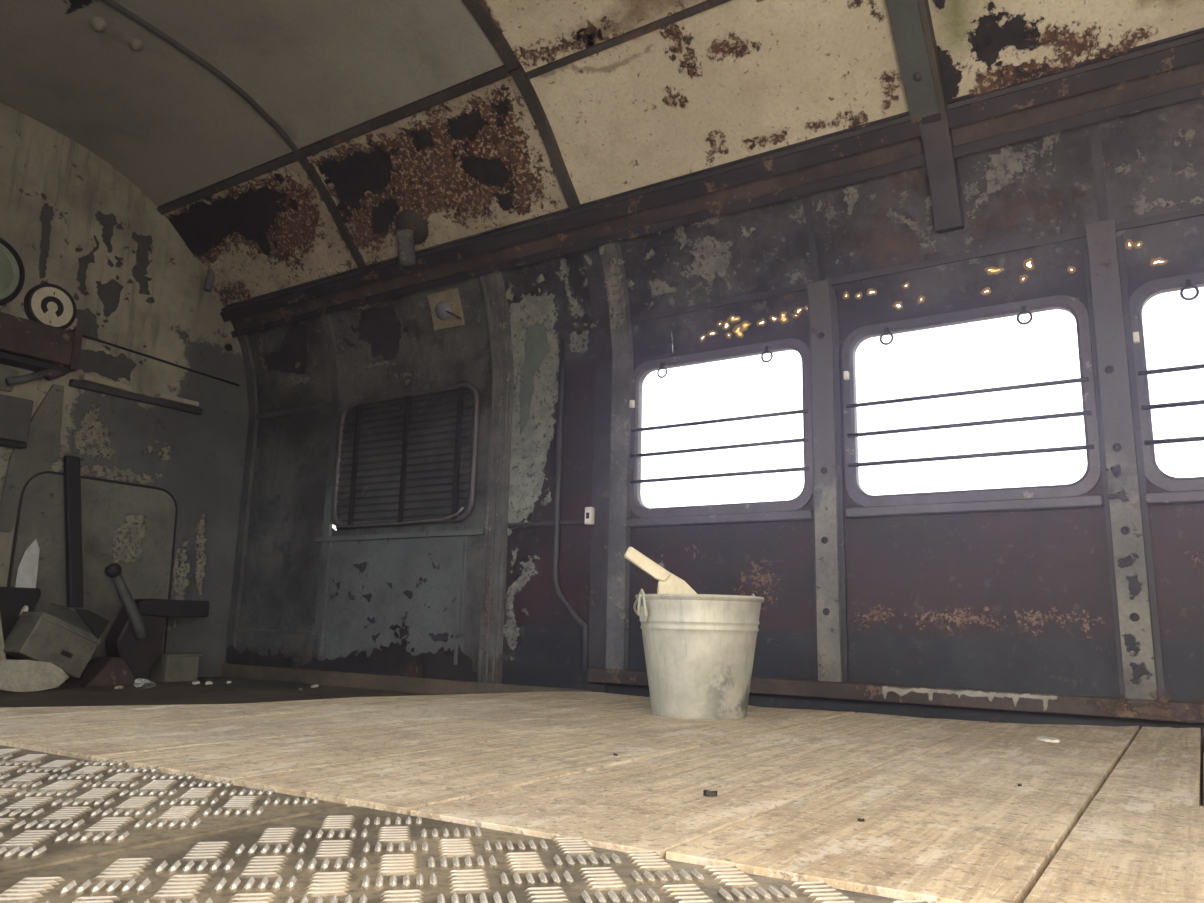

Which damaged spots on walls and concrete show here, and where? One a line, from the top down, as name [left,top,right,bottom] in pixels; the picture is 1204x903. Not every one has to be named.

corrosion [512,17,621,66]
corrosion [629,0,761,78]
corrosion [969,21,1158,97]
corrosion [744,127,787,150]
corrosion [805,111,869,132]
corrosion [164,85,557,272]
peeling [961,134,1057,244]
peeling [69,210,155,381]
peeling [503,215,756,662]
spalling [1118,553,1142,599]
peeling [226,617,477,682]
spalling [1124,629,1149,685]